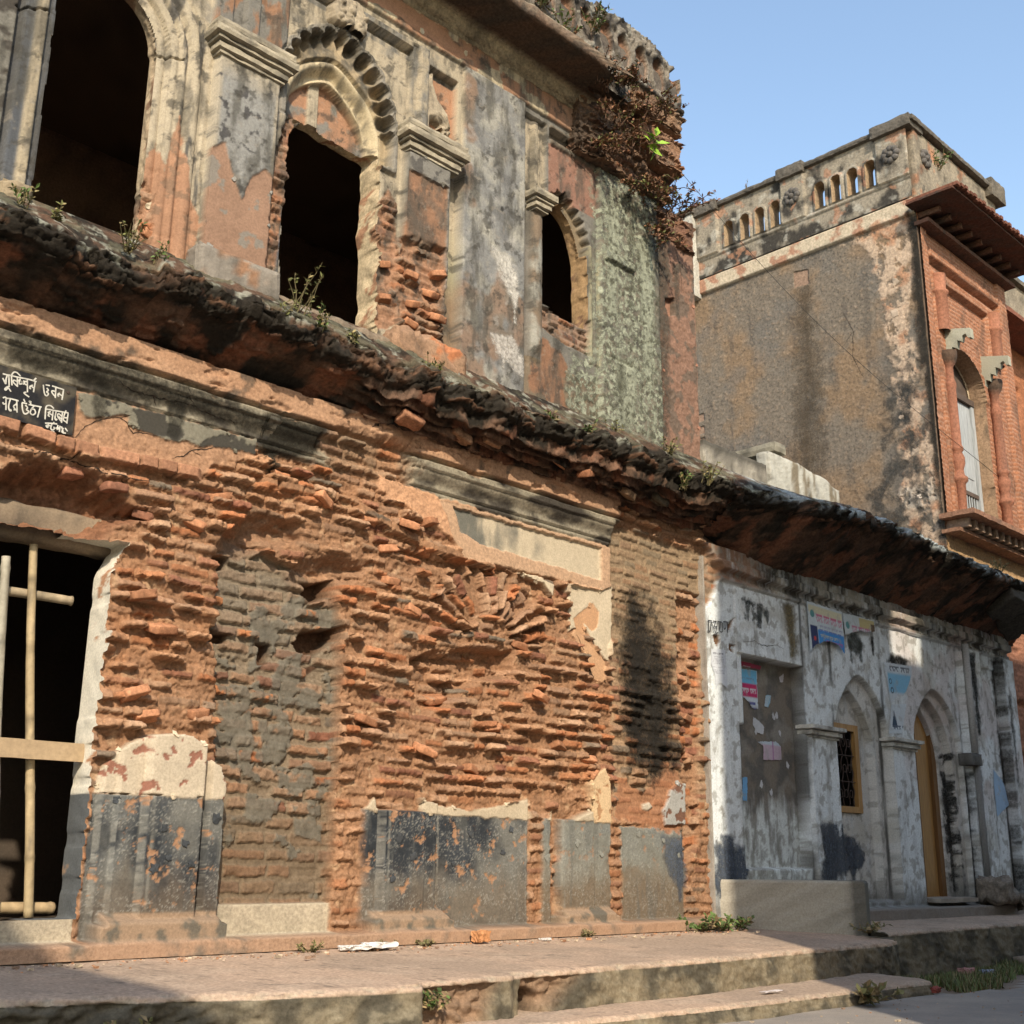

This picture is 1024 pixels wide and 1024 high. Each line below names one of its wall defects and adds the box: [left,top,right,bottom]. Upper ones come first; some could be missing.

flaking render [137,115,296,271]
flaking render [411,151,450,188]
leakage [10,333,324,473]
spalling [374,187,448,342]
leakage [565,172,679,447]
leakage [866,211,947,548]
spalling [0,392,711,961]
leakage [847,632,874,662]
leakage [888,654,909,665]
leakage [714,835,749,898]
leakage [821,822,865,880]
leakage [938,753,982,891]